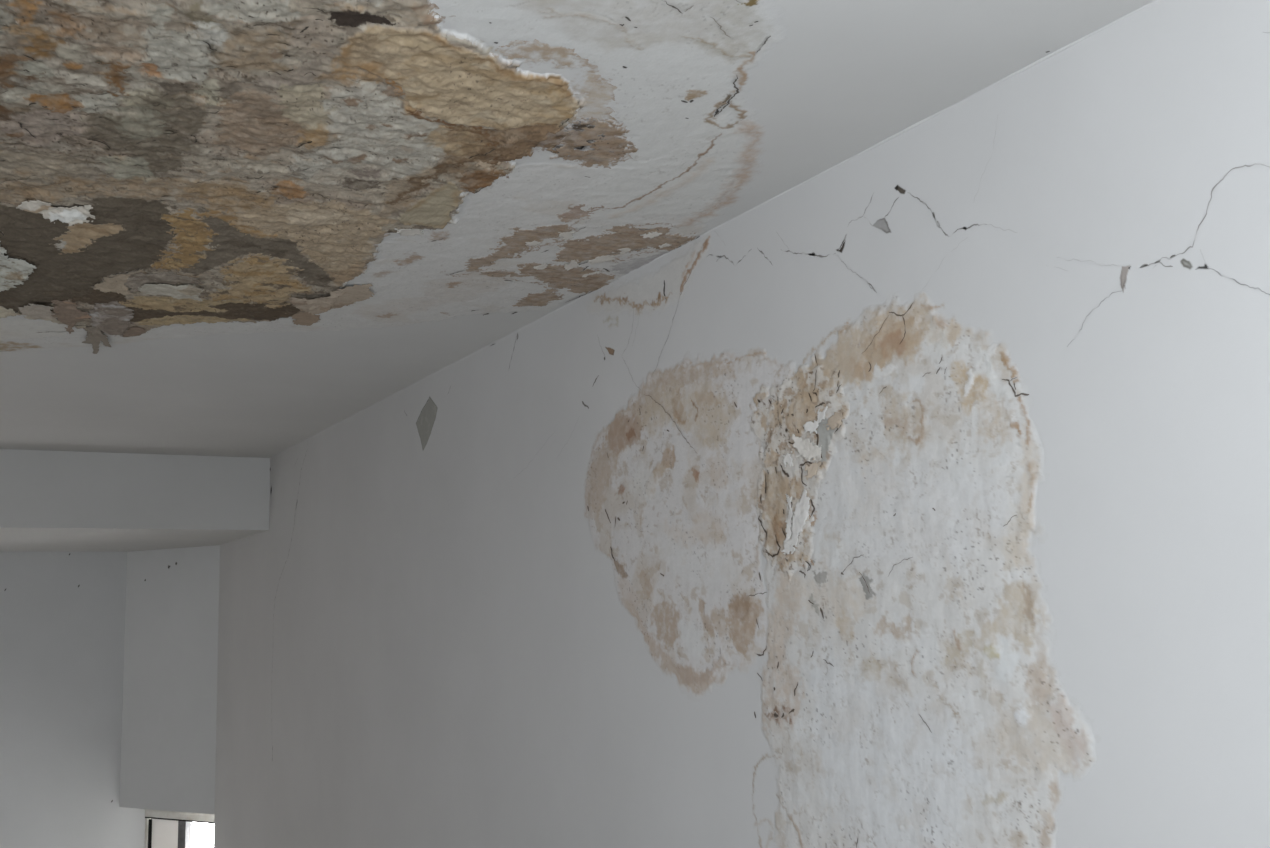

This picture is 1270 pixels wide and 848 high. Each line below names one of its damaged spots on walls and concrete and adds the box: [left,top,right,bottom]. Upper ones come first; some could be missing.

peeling [0,0,710,354]
water stain [424,0,791,230]
crack [662,0,771,117]
crack [707,116,1017,293]
crack [1046,163,1270,347]
spalling [747,352,853,583]
water stain [583,290,1102,848]